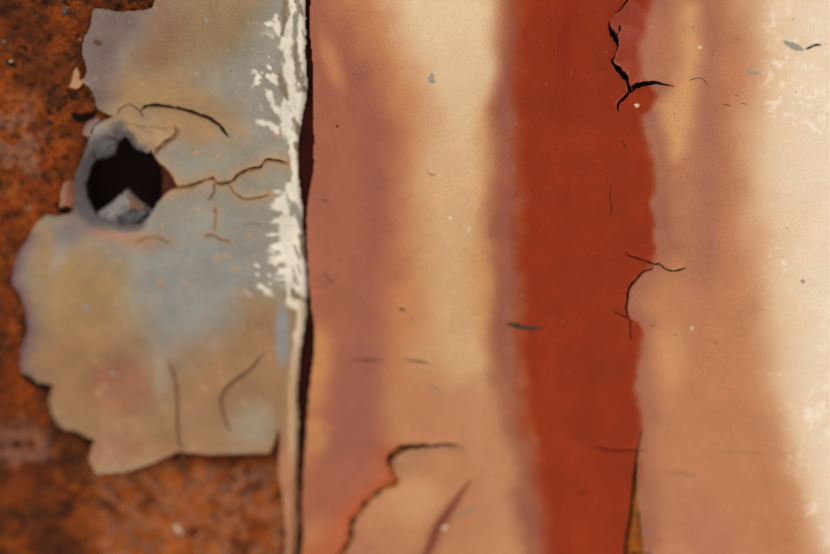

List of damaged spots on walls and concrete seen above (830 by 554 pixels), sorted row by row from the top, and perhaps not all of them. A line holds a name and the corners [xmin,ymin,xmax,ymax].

corrosion [0,104,43,173]
peeling [70,68,86,89]
crack [71,111,97,123]
crack [117,103,230,155]
crack [608,0,707,112]
peeling [31,180,82,233]
peeling [75,0,308,466]
crack [175,158,289,242]
corrosion [301,0,812,554]
crack [613,251,684,341]
corrosion [0,423,50,469]
peeling [337,443,476,554]